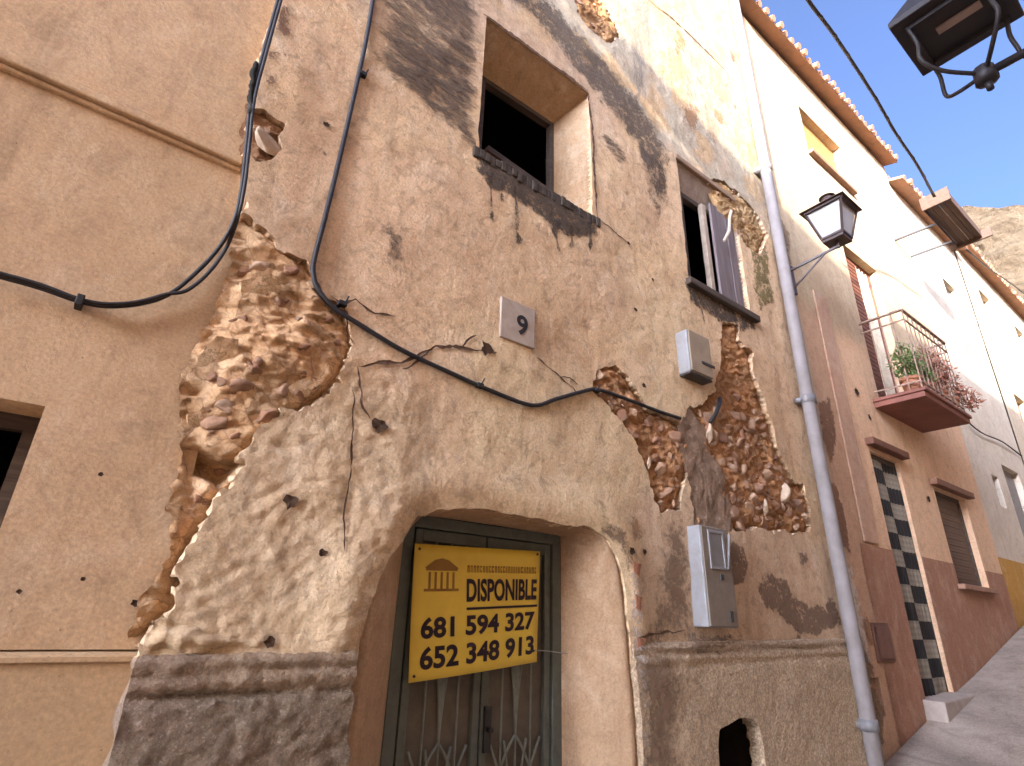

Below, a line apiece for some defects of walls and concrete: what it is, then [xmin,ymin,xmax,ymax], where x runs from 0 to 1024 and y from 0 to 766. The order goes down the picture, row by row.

spalling [238,103,283,171]
water stain [373,0,479,145]
water stain [477,158,597,251]
water stain [516,0,670,214]
spalling [575,0,619,43]
spalling [707,181,764,253]
spalling [127,221,350,650]
crack [331,296,496,551]
spalling [593,325,808,533]
water stain [759,573,842,639]